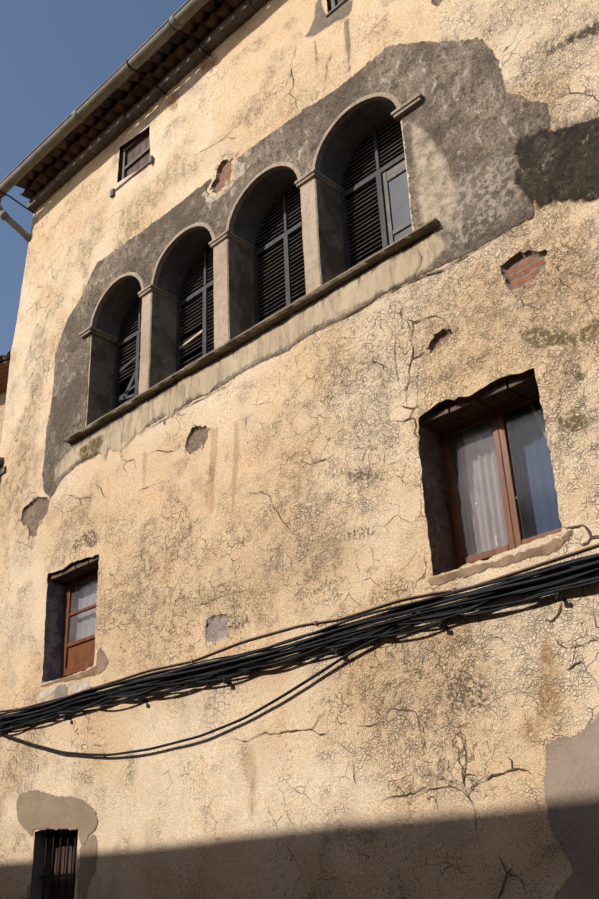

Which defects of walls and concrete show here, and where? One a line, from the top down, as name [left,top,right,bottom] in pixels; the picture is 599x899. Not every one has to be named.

crack [555,83,599,104]
spalling [202,150,245,204]
spalling [496,243,553,294]
water stain [55,115,599,477]
crack [319,239,492,455]
spalling [425,326,458,354]
spalling [183,425,210,455]
spalling [18,496,51,540]
crack [564,525,599,545]
crack [547,603,599,671]
crack [233,710,329,742]
crack [382,723,534,899]